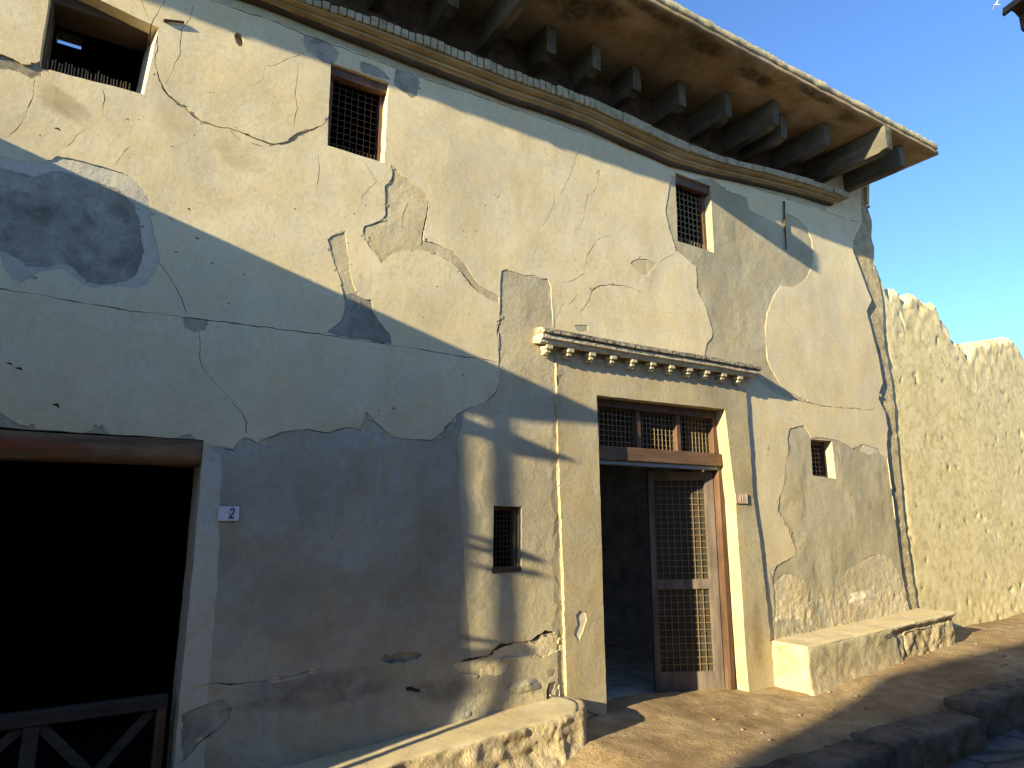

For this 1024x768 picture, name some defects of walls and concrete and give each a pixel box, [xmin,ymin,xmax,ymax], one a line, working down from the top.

crack [151,3,328,148]
spalling [0,155,160,289]
crack [571,274,616,307]
spalling [0,413,51,433]
spalling [180,169,587,768]
spalling [772,188,917,635]